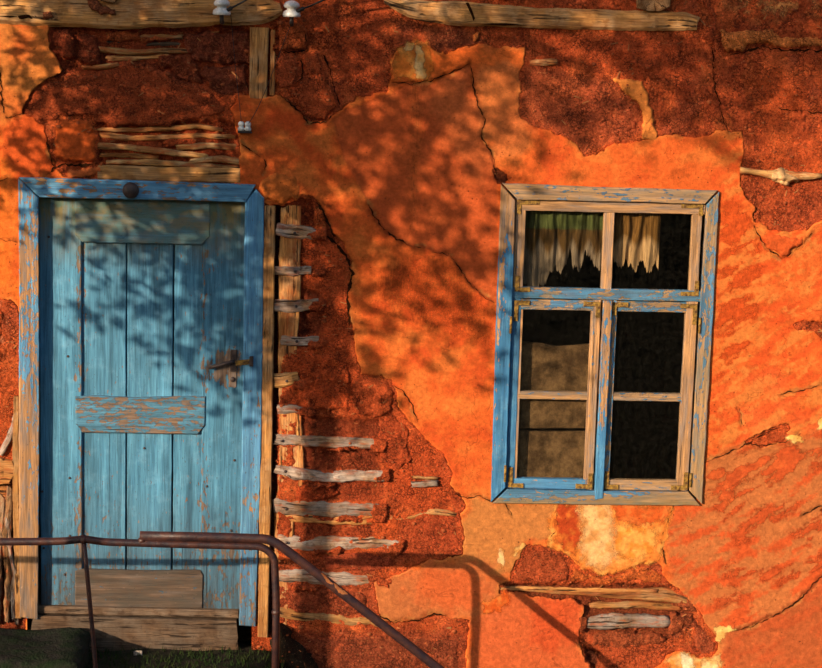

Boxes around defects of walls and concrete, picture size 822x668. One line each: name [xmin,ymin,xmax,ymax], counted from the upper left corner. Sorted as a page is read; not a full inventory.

flaking render [252,195,470,668]